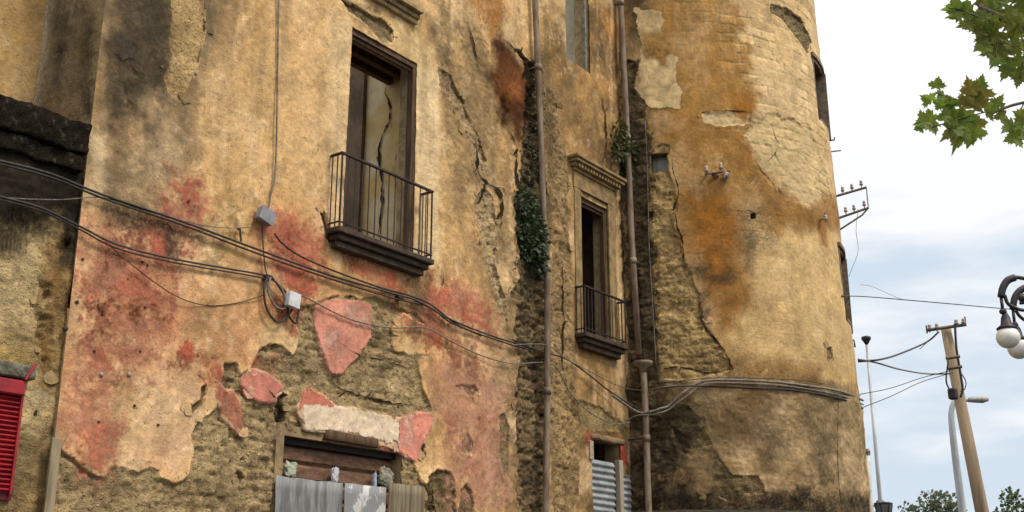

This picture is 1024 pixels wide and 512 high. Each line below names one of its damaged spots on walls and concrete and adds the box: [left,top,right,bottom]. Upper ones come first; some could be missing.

corrosion [472,0,528,141]
peeling [633,7,683,109]
flaking render [768,2,813,56]
crack [474,130,521,226]
peeling [697,108,833,210]
corrosion [744,150,840,245]
flaking render [648,141,736,385]
peeling [68,163,214,488]
peeling [178,338,334,438]
crack [656,323,733,374]